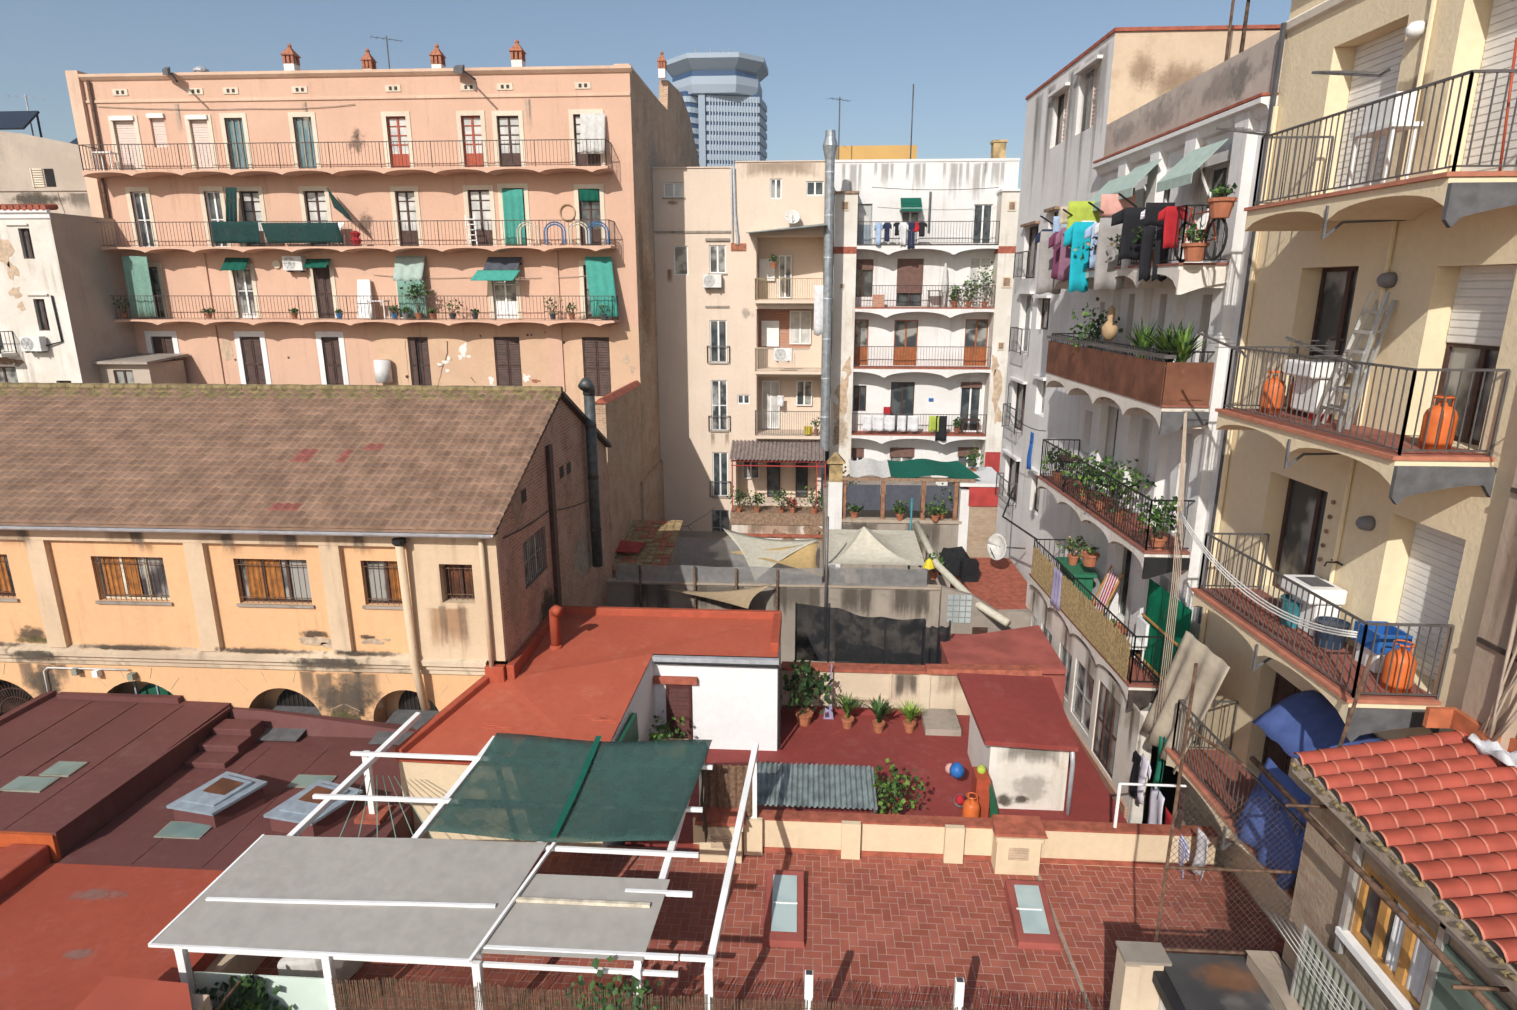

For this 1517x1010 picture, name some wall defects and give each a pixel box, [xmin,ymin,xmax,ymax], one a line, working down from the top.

flaking render [0,239,25,311]
flaking render [833,355,852,421]
damp [0,626,64,695]
damp [216,647,391,720]
damp [998,795,1028,806]